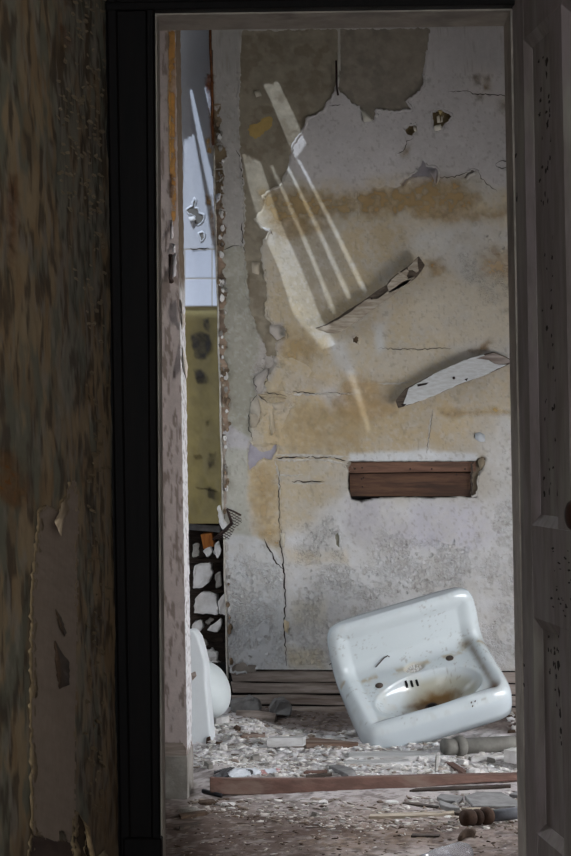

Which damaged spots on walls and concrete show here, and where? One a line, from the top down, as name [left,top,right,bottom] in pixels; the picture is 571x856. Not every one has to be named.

spalling [431,108,454,133]
peeling [402,161,440,186]
peeling [185,197,206,242]
damp [265,192,350,221]
damp [357,179,471,214]
peeling [212,27,430,514]
crack [264,453,350,665]
spalling [183,524,256,675]